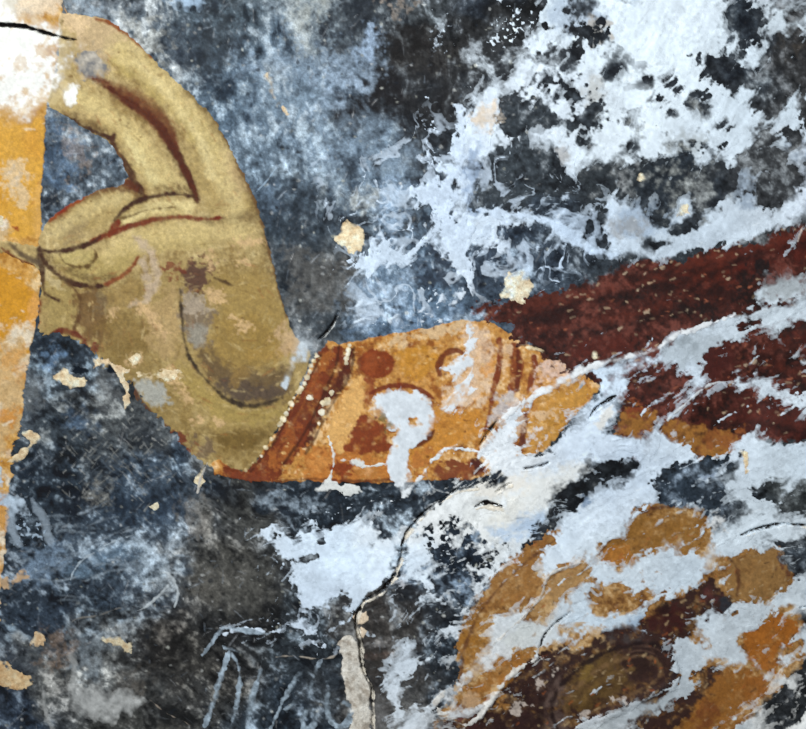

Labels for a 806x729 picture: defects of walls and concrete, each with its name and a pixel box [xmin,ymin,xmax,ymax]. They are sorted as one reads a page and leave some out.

crack [0,22,77,41]
peeling [60,49,109,109]
peeling [219,0,806,729]
crack [354,462,549,729]